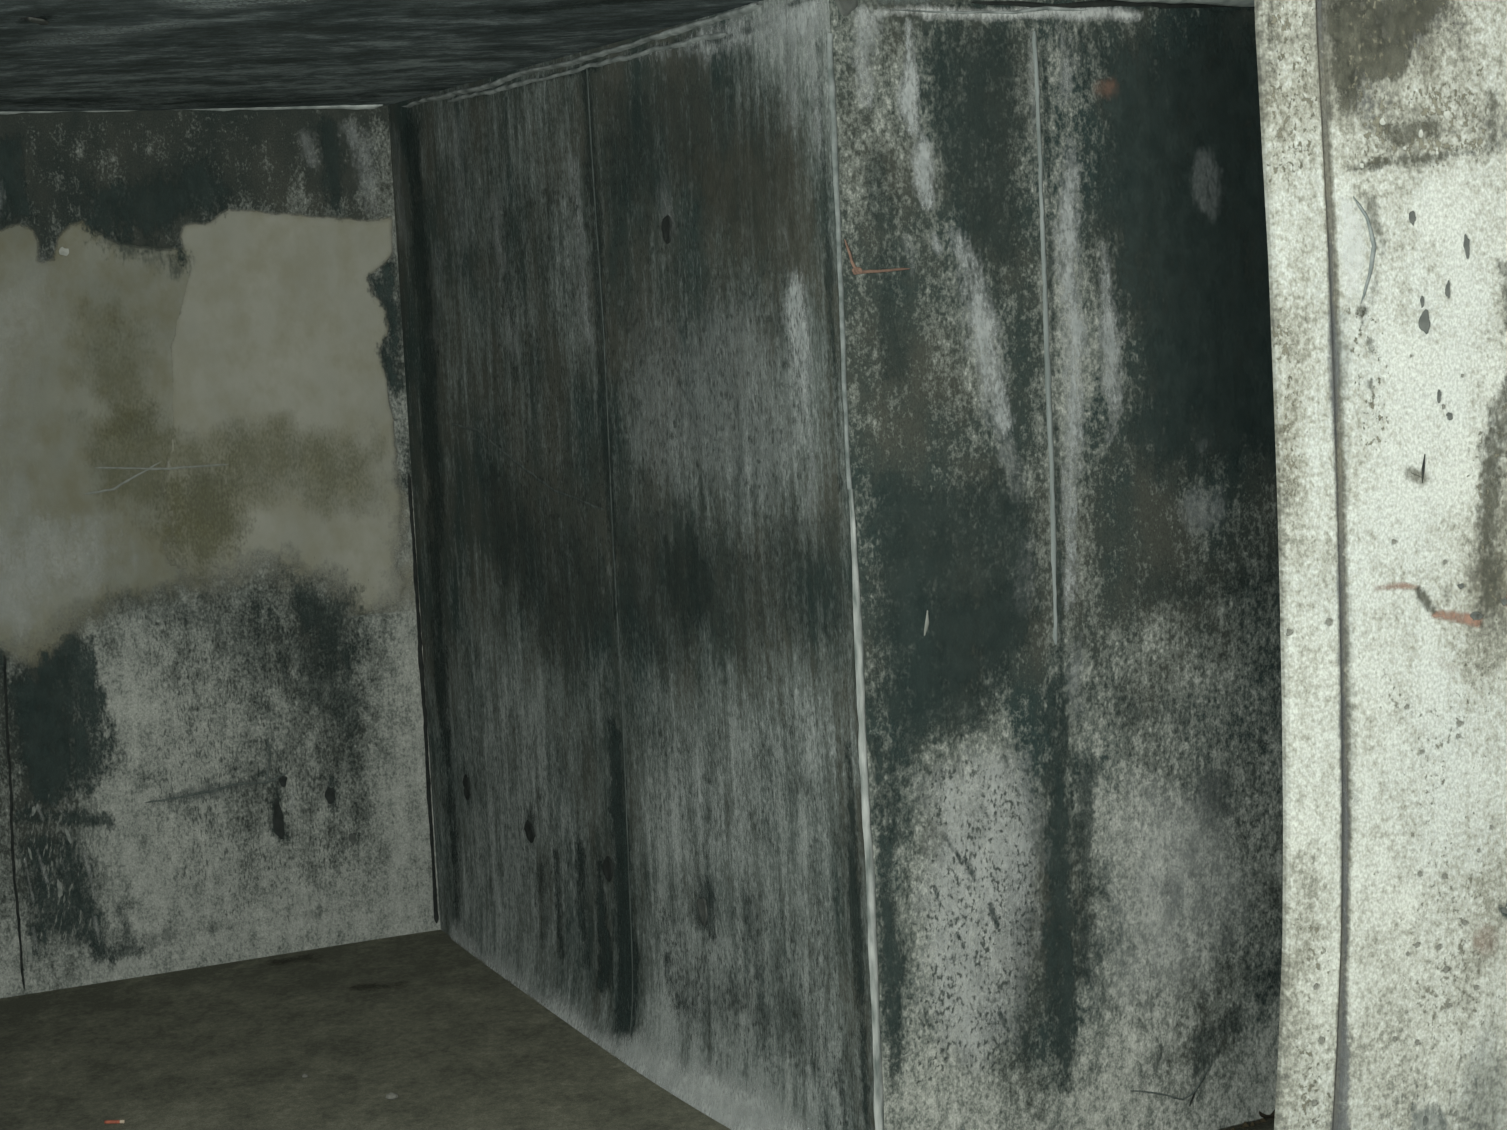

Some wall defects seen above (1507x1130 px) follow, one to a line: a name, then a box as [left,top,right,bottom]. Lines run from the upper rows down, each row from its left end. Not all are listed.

water stain [0,634,117,830]
water stain [368,111,451,767]
water stain [471,126,844,668]
water stain [443,473,1040,1130]
water stain [679,0,824,164]
water stain [898,26,1023,434]
water stain [1005,674,1097,1089]
water stain [1052,0,1477,605]
corrosion [1379,584,1483,626]